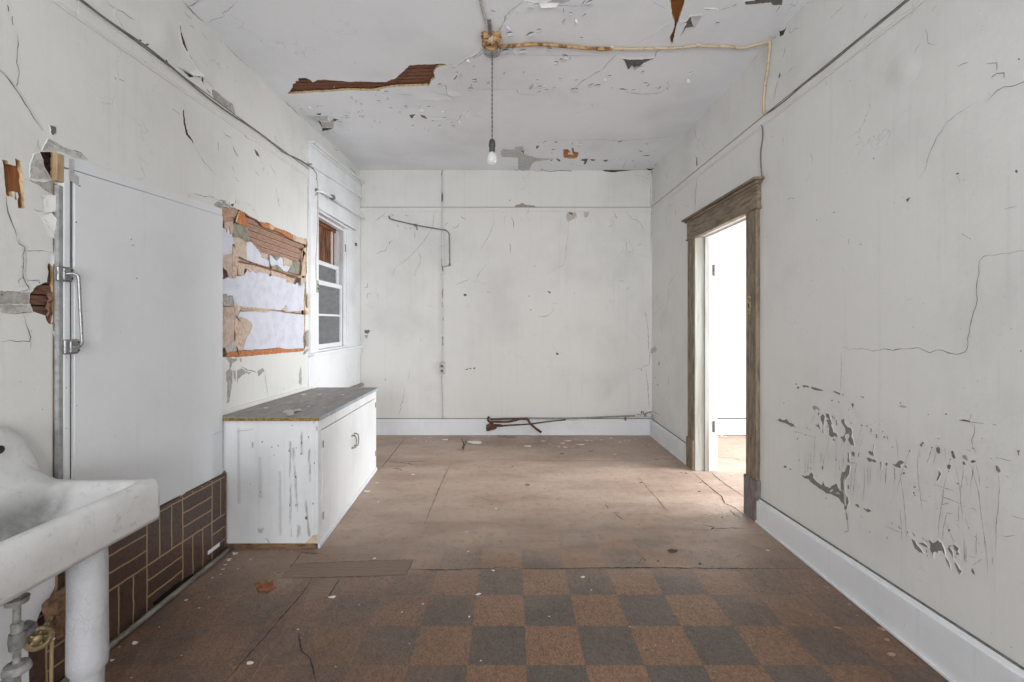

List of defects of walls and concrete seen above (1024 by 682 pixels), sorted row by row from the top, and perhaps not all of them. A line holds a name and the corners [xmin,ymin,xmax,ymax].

peeling [670,0,785,41]
crack [173,108,280,222]
spalling [290,64,472,133]
peeling [499,141,657,170]
crack [921,62,1023,175]
crack [1,198,44,342]
flaking render [0,152,57,335]
flaking render [214,199,309,404]
crack [841,251,1017,374]
peeling [774,384,976,533]
peeling [891,522,975,575]